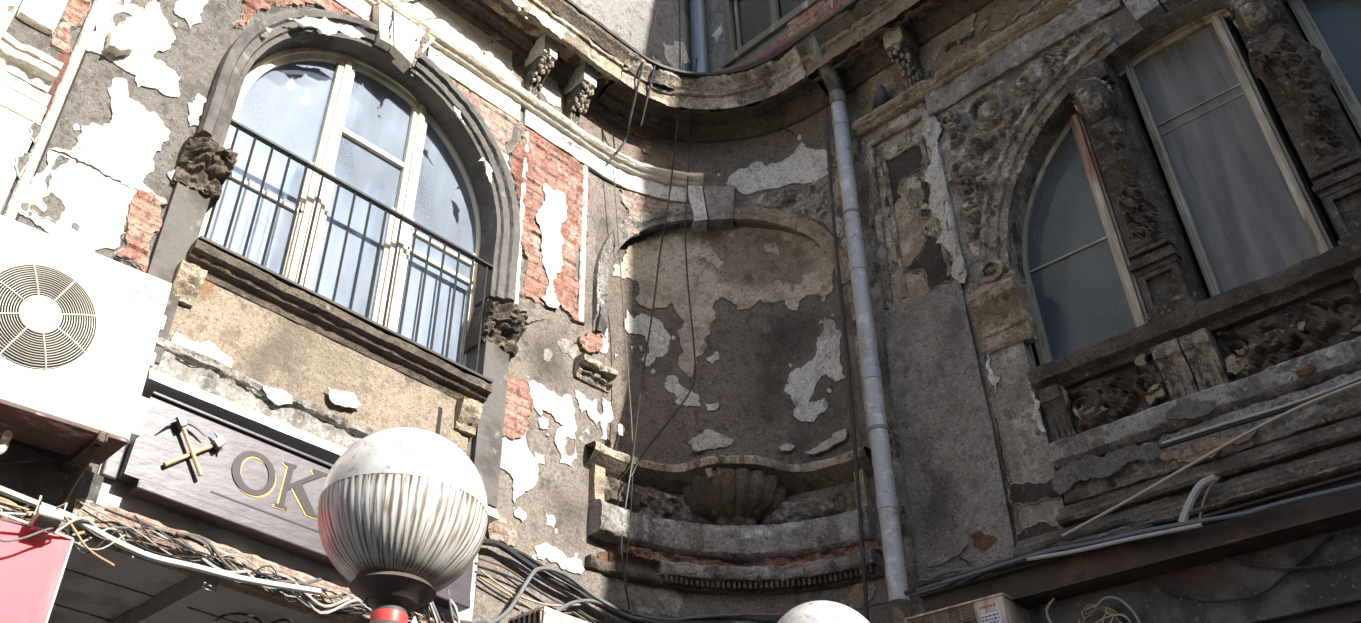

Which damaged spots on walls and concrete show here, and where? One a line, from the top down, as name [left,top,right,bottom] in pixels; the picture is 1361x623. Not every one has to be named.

flaking render [232,0,373,39]
spalling [409,28,438,77]
spalling [510,50,526,83]
peeling [650,41,691,70]
peeling [14,0,209,273]
peeling [876,108,967,303]
peeling [450,76,845,423]
peeling [486,373,624,548]
peeling [532,514,624,575]